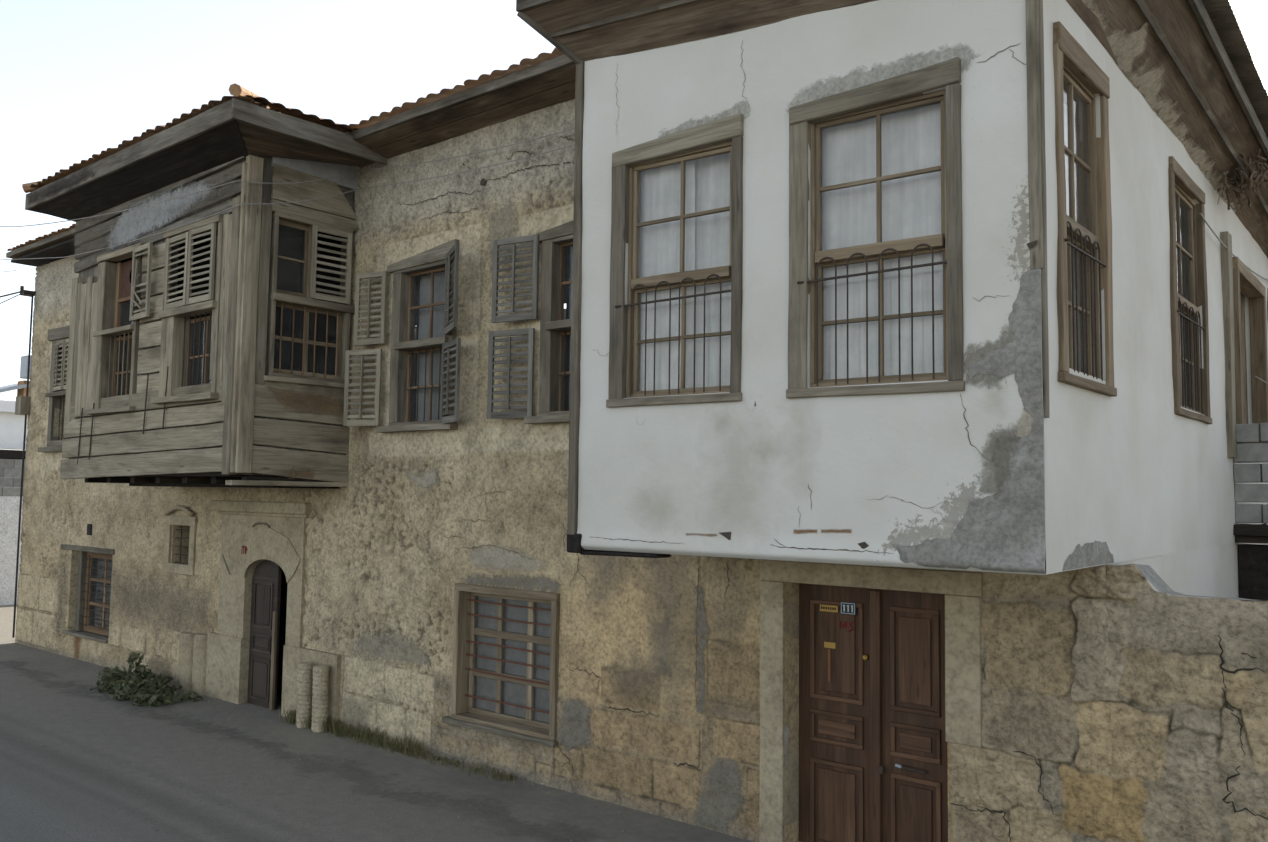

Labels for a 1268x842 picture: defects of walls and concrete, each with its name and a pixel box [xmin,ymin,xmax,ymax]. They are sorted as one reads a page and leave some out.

crack [977,43,1027,65]
crack [399,136,575,219]